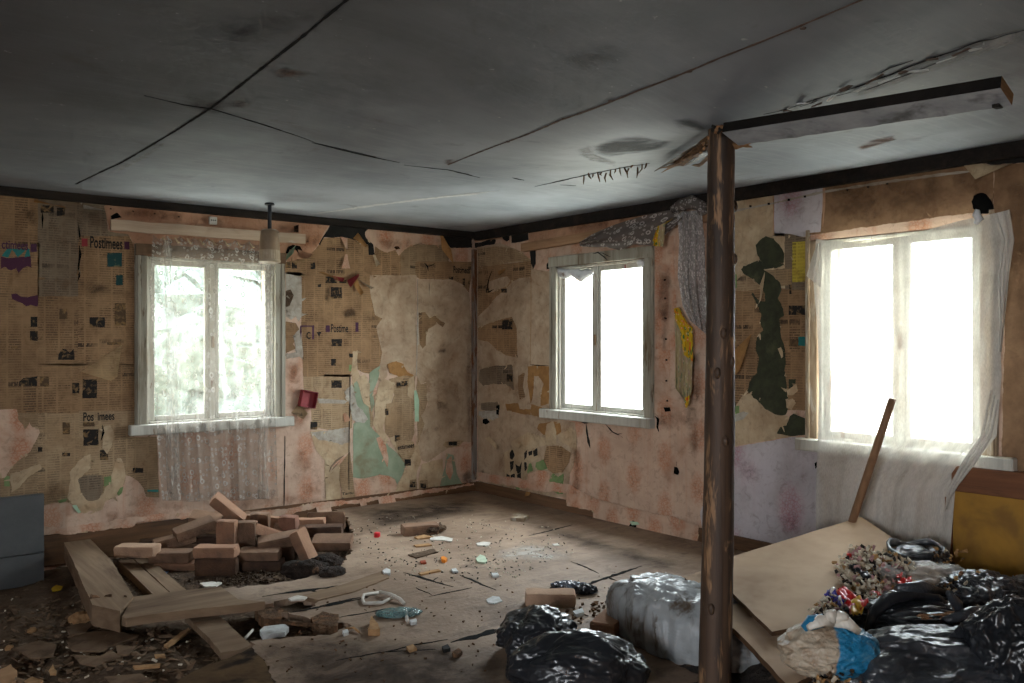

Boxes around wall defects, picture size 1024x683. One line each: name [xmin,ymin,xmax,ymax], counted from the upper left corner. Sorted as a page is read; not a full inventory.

peeling [826,47,983,102]
water stain [600,139,666,153]
peeling [734,188,823,543]
peeling [292,404,308,419]
peeling [477,405,500,424]
peeling [0,409,40,478]
peeling [353,433,396,497]